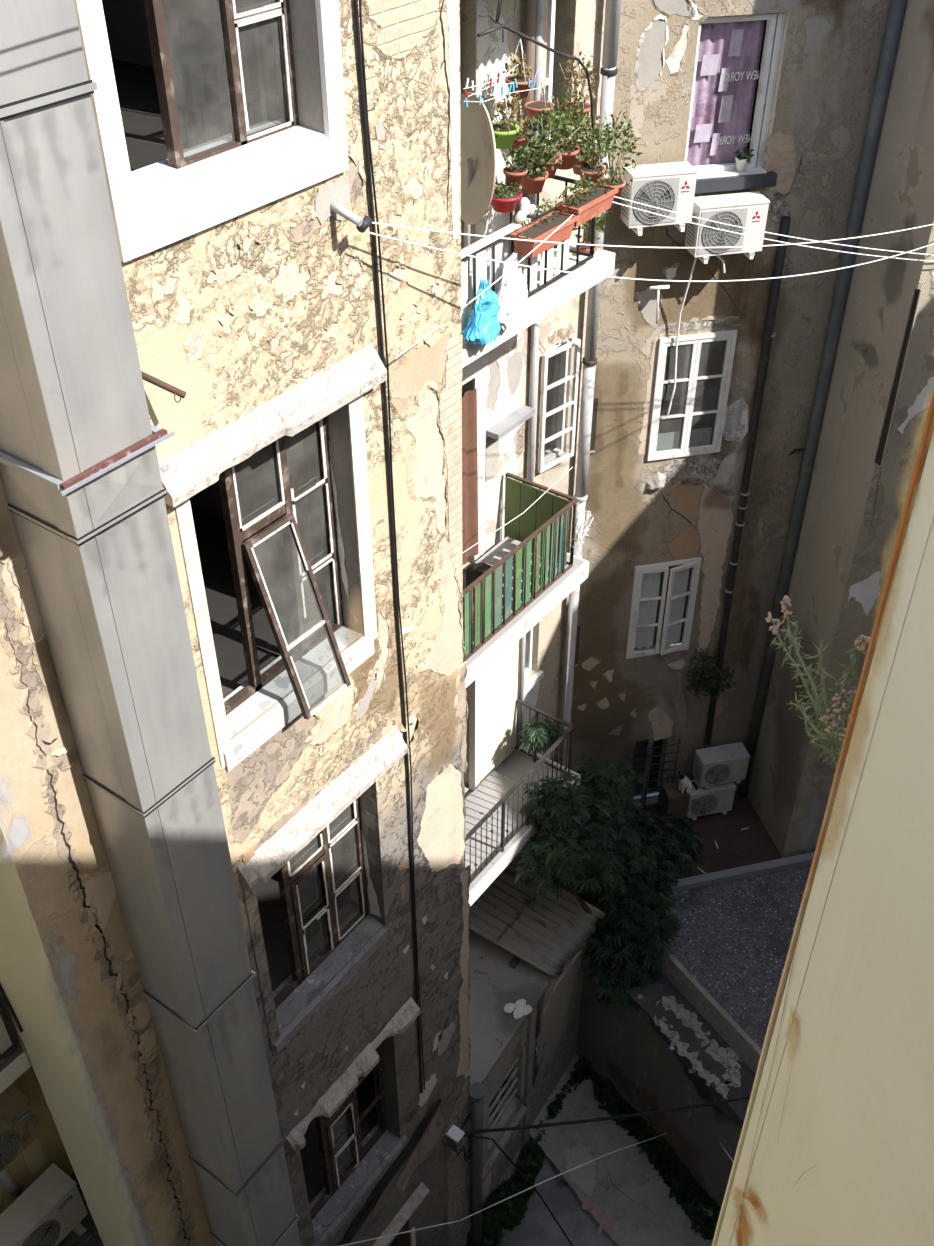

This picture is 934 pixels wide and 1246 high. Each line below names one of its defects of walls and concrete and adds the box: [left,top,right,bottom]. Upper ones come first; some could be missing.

peeling [634,0,709,92]
peeling [804,15,830,58]
peeling [346,148,367,211]
peeling [203,227,262,288]
peeling [289,210,321,247]
peeling [151,254,363,363]
peeling [844,571,882,615]
peeling [384,178,492,1246]
peeling [577,656,674,741]
crack [5,604,190,1246]